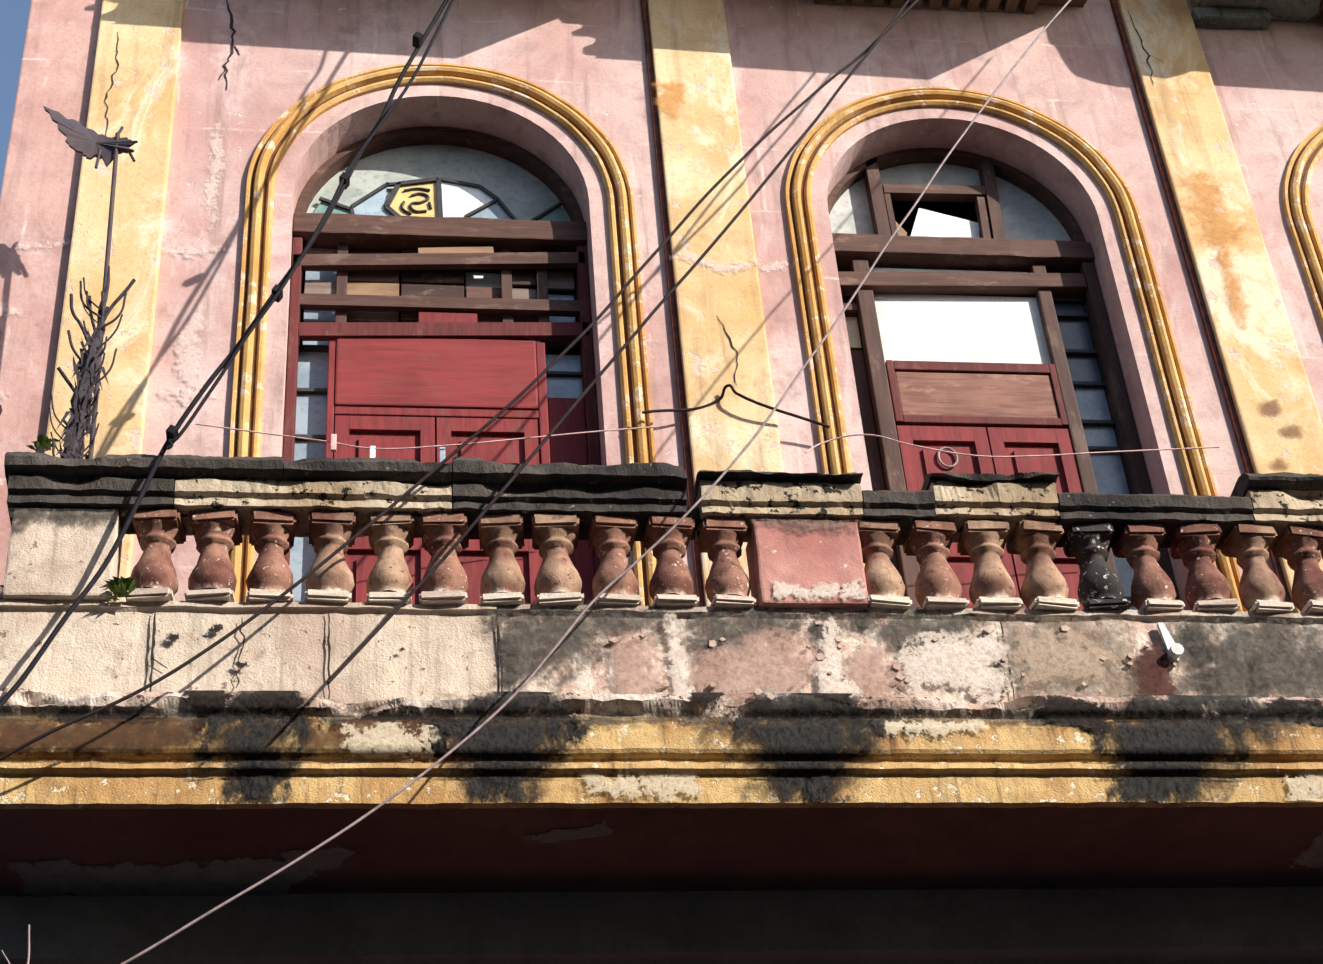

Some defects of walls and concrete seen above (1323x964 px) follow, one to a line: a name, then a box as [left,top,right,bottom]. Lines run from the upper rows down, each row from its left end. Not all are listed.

crack [104,32,119,133]
crack [218,0,240,90]
crack [1127,10,1163,85]
crack [716,315,738,385]
crack [149,609,167,692]
peeling [340,709,472,761]
flaking render [608,633,670,695]
damp [0,603,1323,802]
peeling [688,621,1177,740]
peeling [1285,771,1323,801]